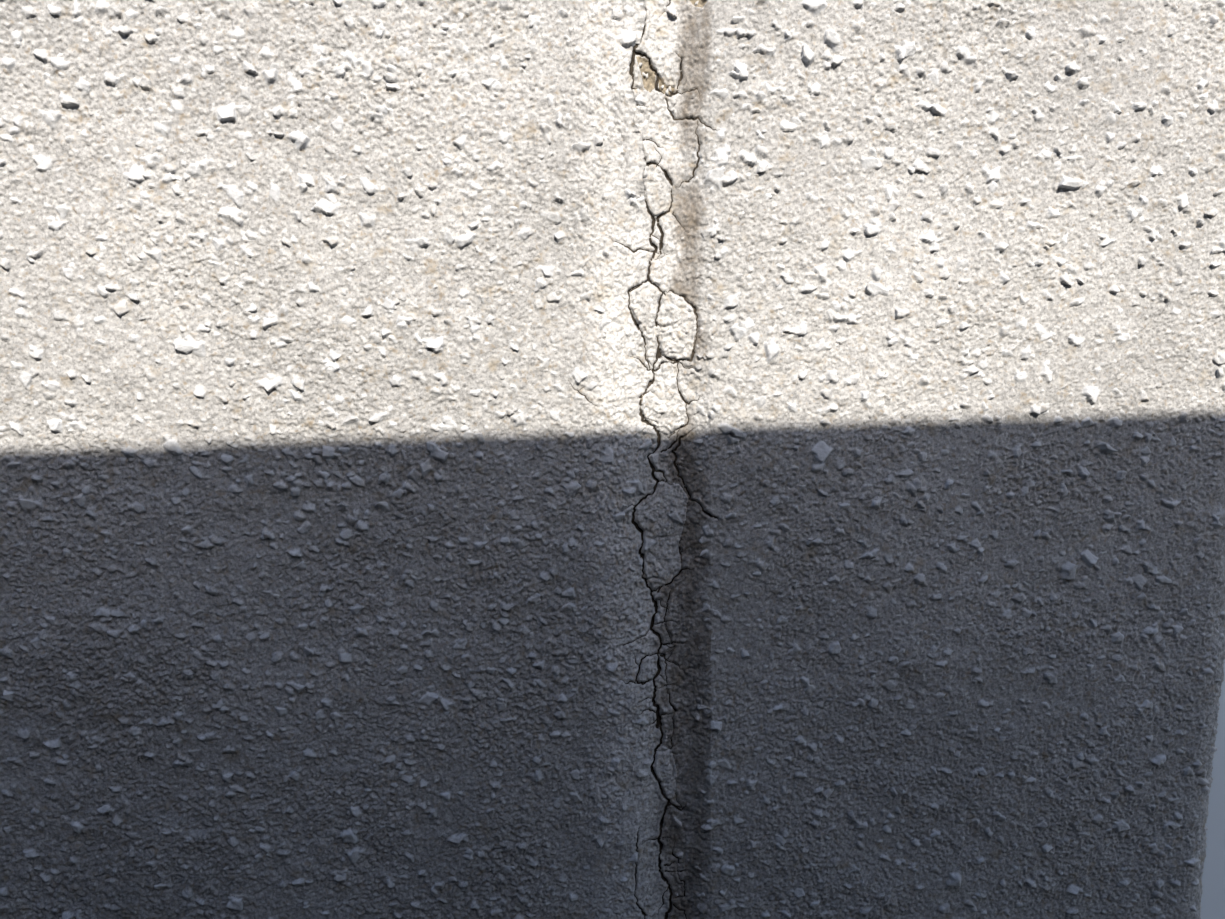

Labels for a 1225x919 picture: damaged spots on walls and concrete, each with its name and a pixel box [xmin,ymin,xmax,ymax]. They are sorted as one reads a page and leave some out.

crack [607,0,719,919]